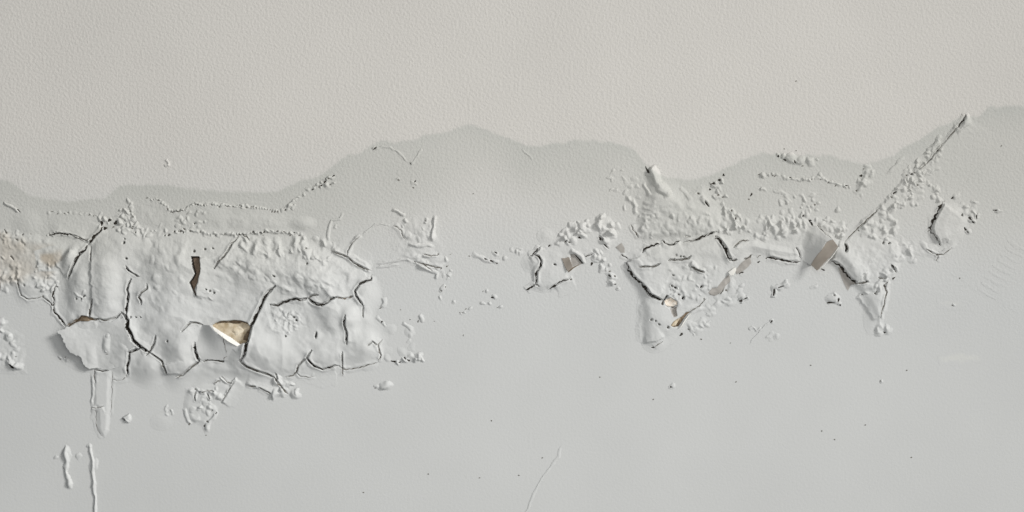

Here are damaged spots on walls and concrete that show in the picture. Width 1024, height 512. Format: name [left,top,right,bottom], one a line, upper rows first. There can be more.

crack [17,227,383,433]
peeling [4,205,424,402]
crack [526,247,569,290]
crack [585,225,801,311]
peeling [521,210,918,353]
crack [832,209,897,314]
crack [928,201,949,261]